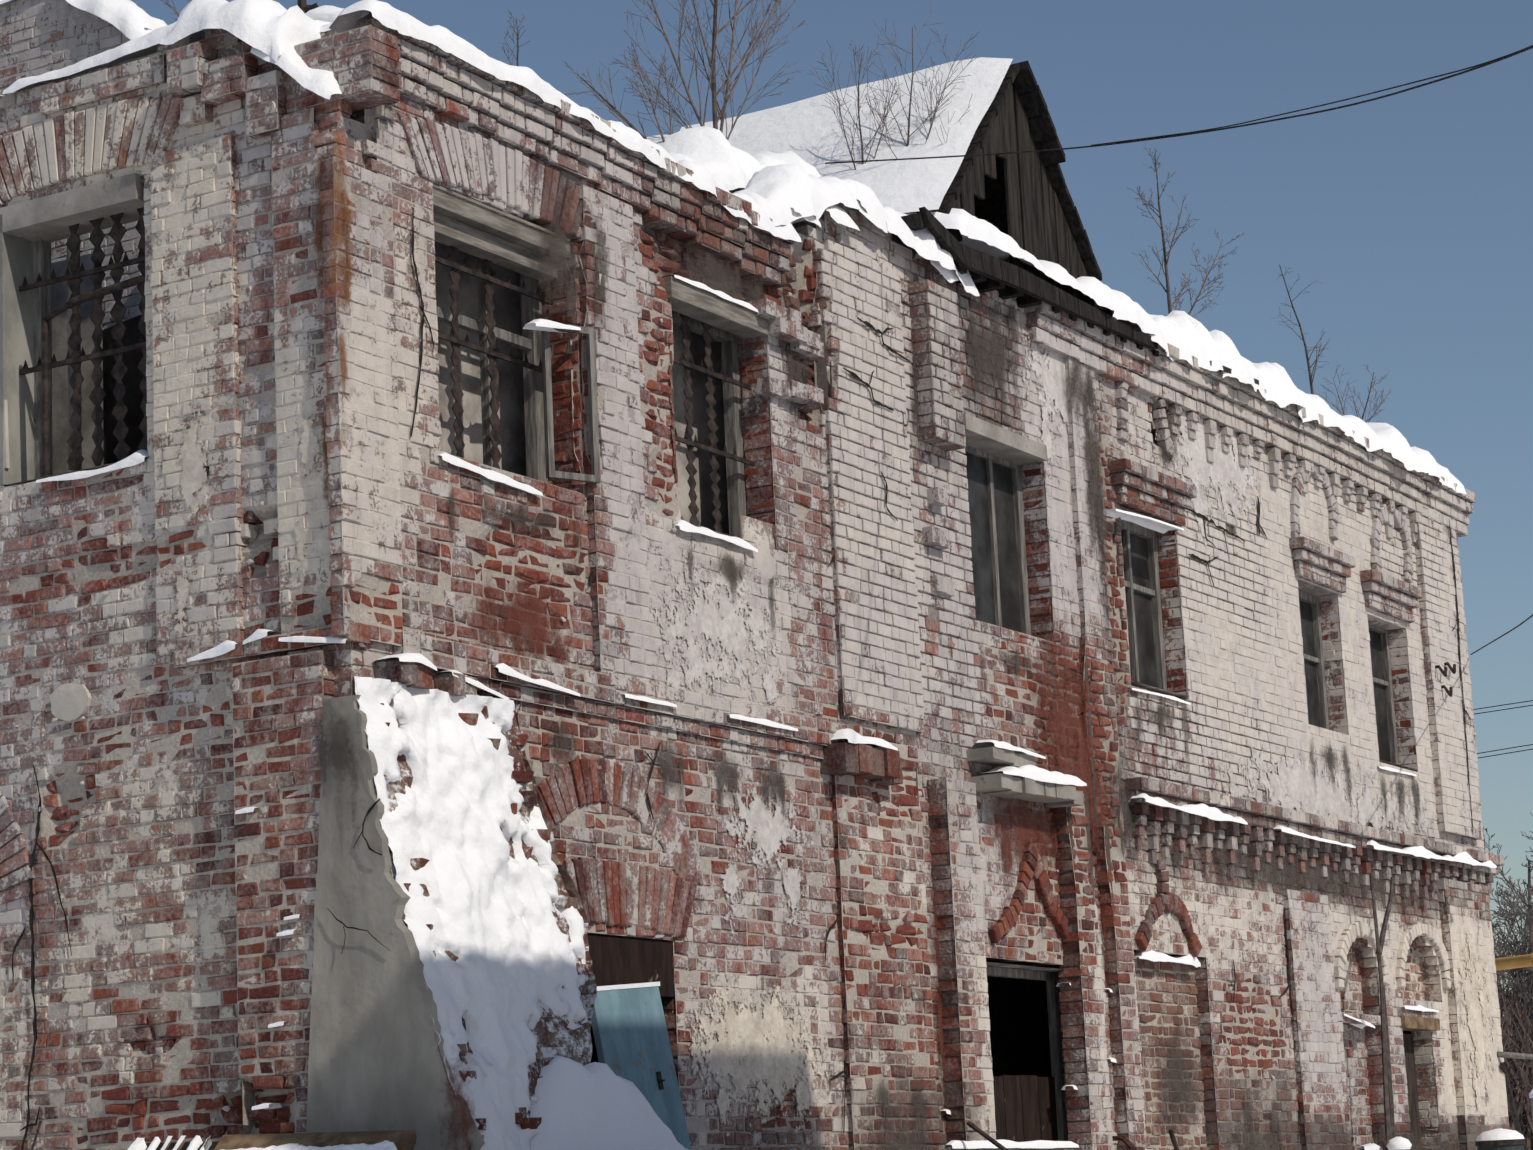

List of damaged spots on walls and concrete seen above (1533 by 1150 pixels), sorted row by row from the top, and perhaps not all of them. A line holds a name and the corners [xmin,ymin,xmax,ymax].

crack [410,208,434,437]
crack [830,317,911,411]
spalling [40,378,213,635]
crack [881,471,898,521]
spalling [1033,406,1130,903]
crack [353,799,382,856]
peeling [697,773,815,934]
damp [1310,747,1351,795]
damp [1382,778,1420,821]
crack [327,908,389,954]
peeling [684,972,833,1136]
spalling [45,1085,295,1150]